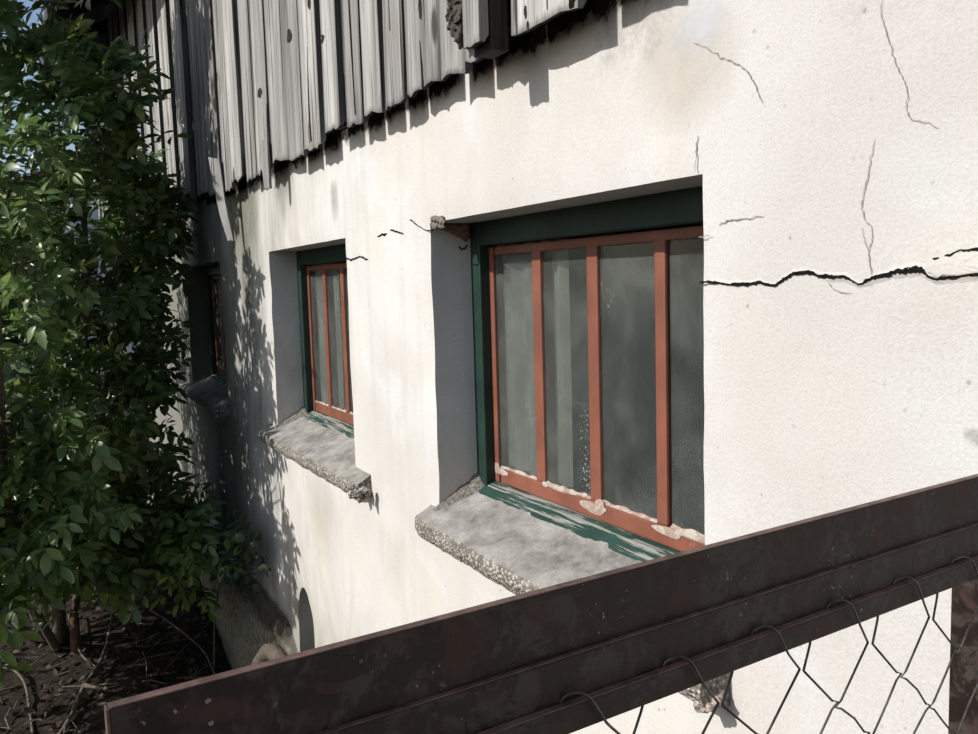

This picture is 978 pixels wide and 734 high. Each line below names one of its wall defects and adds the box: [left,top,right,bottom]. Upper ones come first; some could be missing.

water stain [472,0,631,82]
crack [695,43,762,101]
crack [880,0,939,128]
crack [377,219,434,237]
crack [699,138,978,293]
peeling [542,481,606,516]
peeling [652,525,705,544]